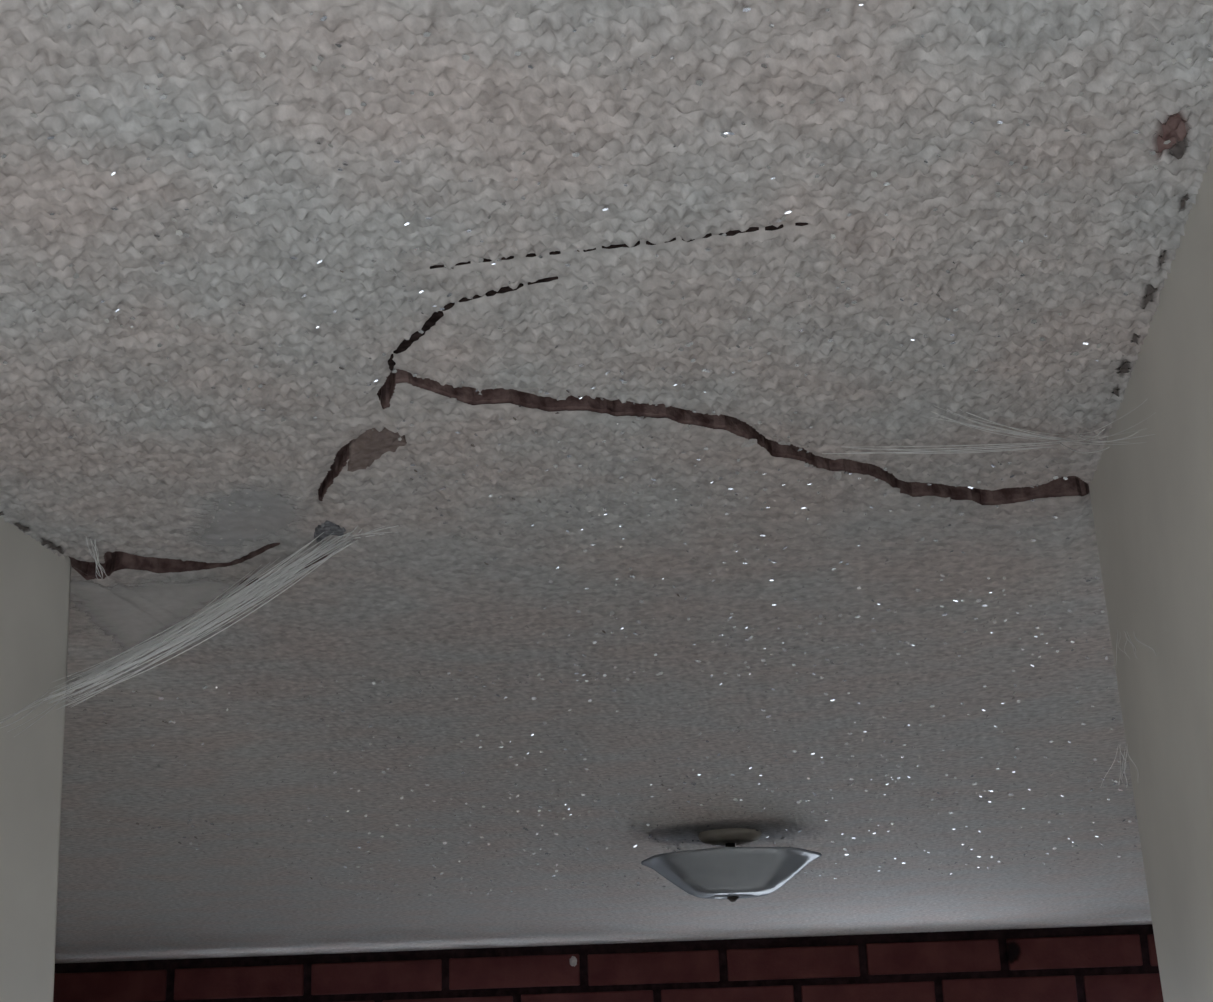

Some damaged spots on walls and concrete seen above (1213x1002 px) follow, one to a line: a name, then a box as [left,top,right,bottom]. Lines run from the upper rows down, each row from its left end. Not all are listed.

crack [377,222,1090,505]
crack [318,439,355,501]
crack [0,511,328,586]
peeling [314,520,346,542]